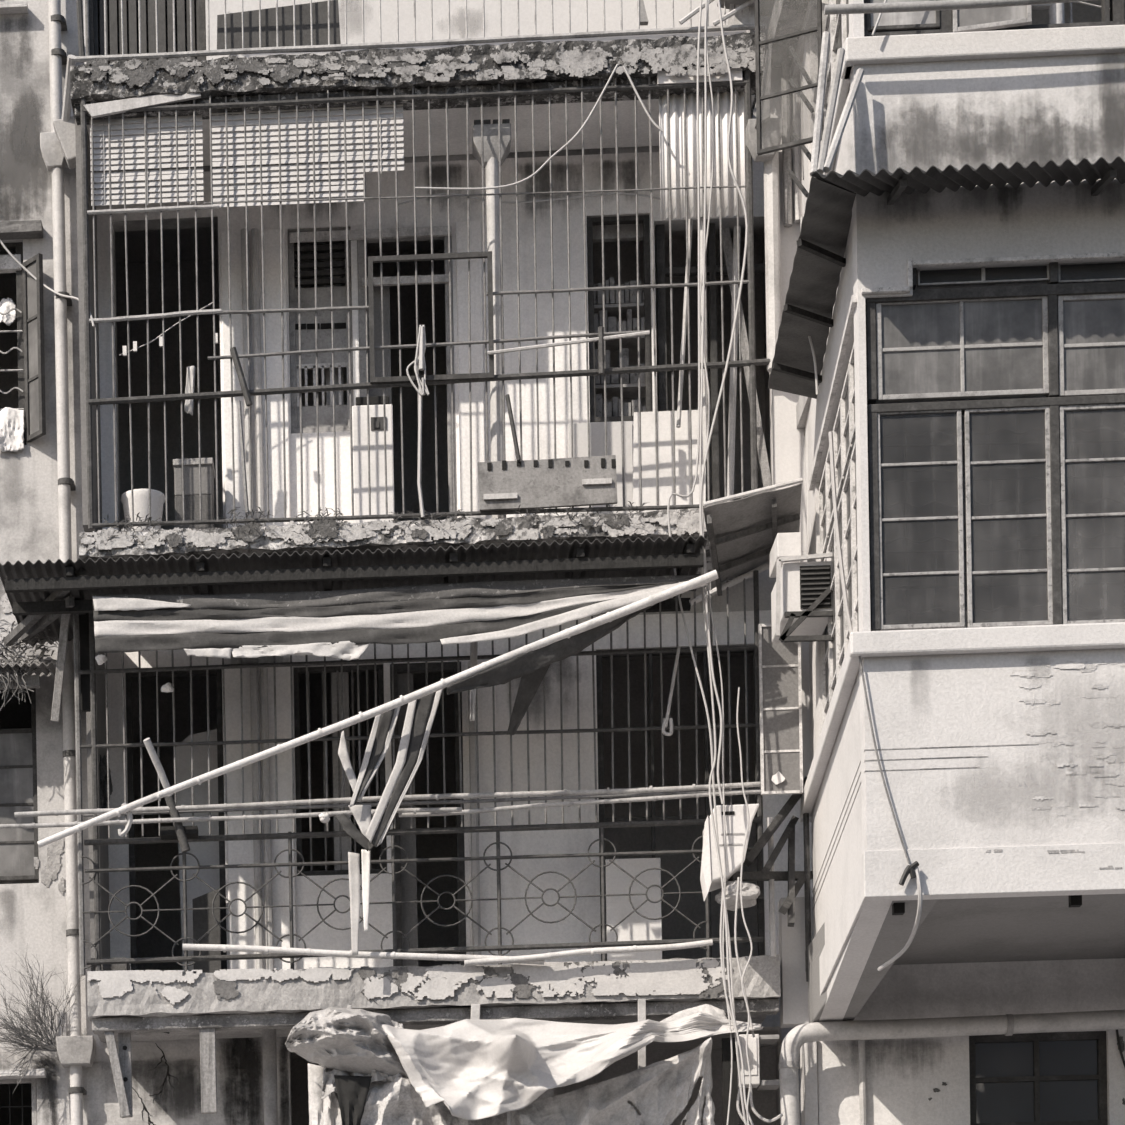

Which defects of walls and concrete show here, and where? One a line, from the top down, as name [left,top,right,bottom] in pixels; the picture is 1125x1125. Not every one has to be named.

leakage [5,18,30,65]
peeling [79,43,764,89]
leakage [0,93,50,220]
peeling [81,512,707,550]
flaking render [1010,658,1125,706]
peeling [87,958,730,1005]
leakage [222,1038,261,1125]
leakage [280,1039,289,1125]